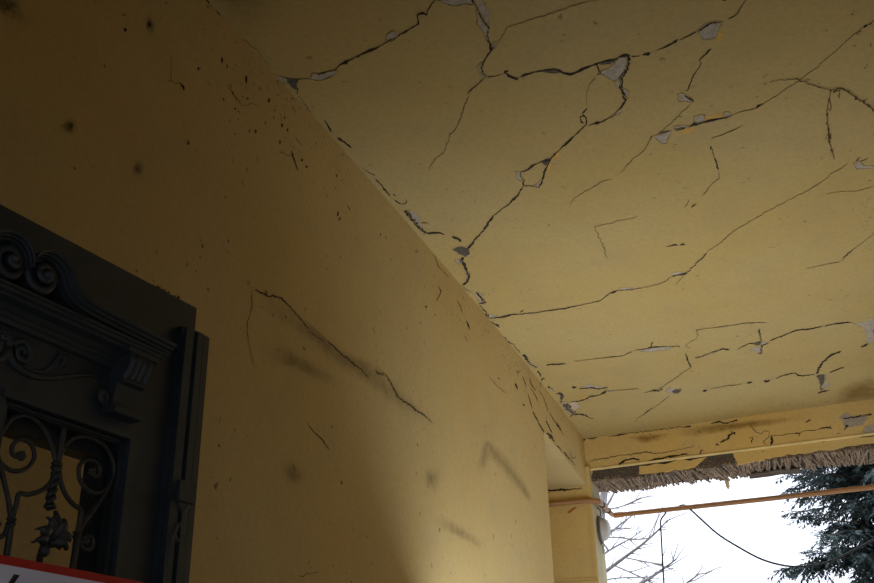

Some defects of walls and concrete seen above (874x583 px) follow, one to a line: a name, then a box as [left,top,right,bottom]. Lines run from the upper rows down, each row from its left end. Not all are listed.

crack [242,0,872,465]
spalling [838,412,874,434]
crack [548,486,582,494]